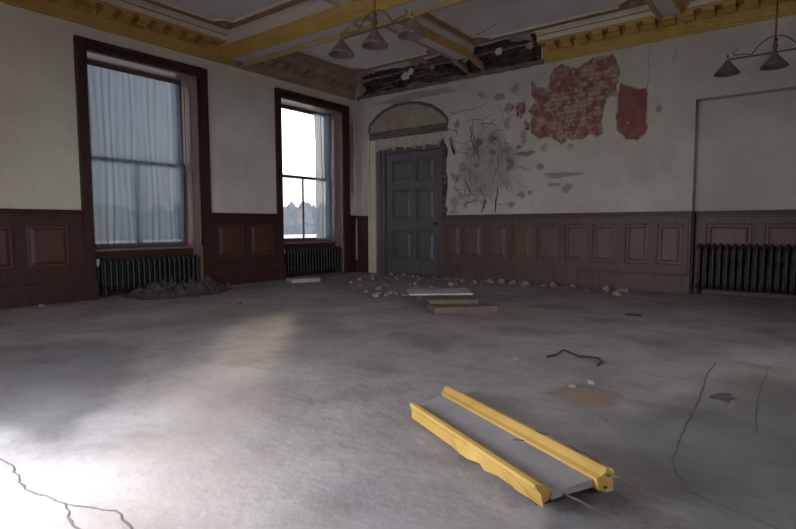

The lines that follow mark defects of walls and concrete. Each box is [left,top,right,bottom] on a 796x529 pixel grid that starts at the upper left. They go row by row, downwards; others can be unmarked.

flaking render [478,53,649,152]
crack [0,458,132,529]
crack [671,362,778,529]